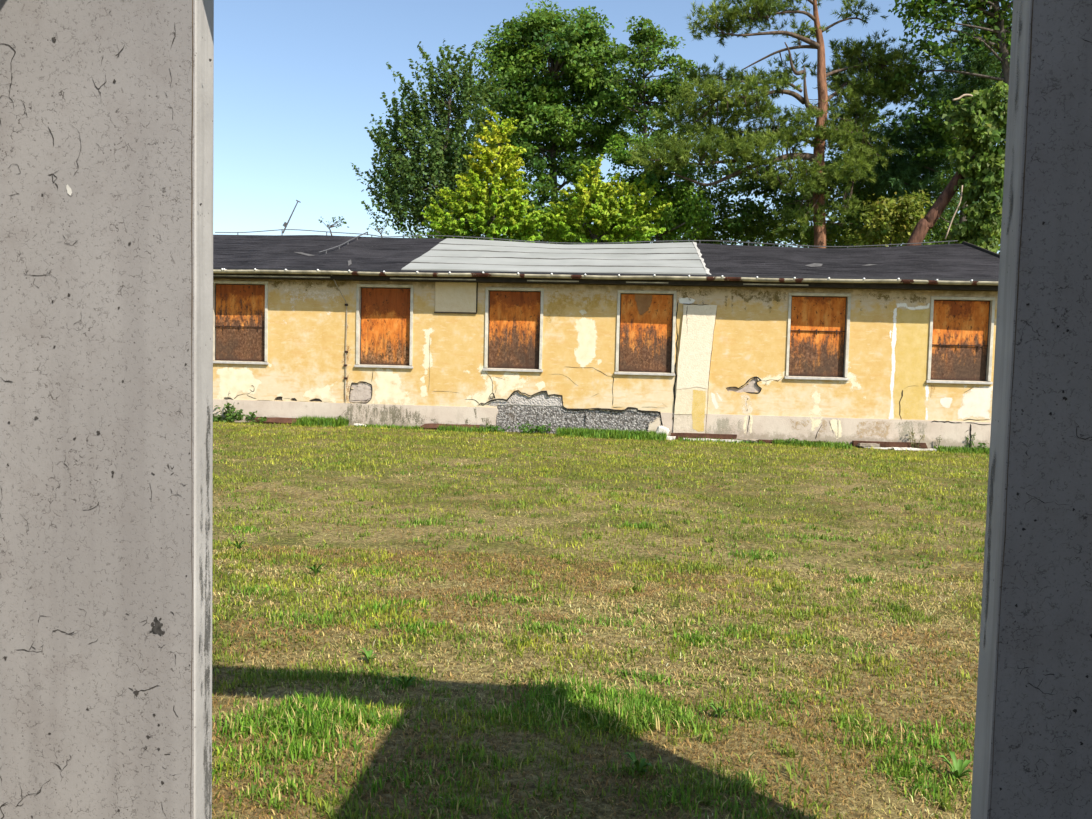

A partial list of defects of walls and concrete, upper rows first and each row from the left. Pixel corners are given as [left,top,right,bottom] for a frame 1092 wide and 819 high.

peeling [214,367,338,403]
peeling [349,327,434,405]
spalling [463,364,663,434]
peeling [574,309,602,367]
spalling [711,376,762,409]